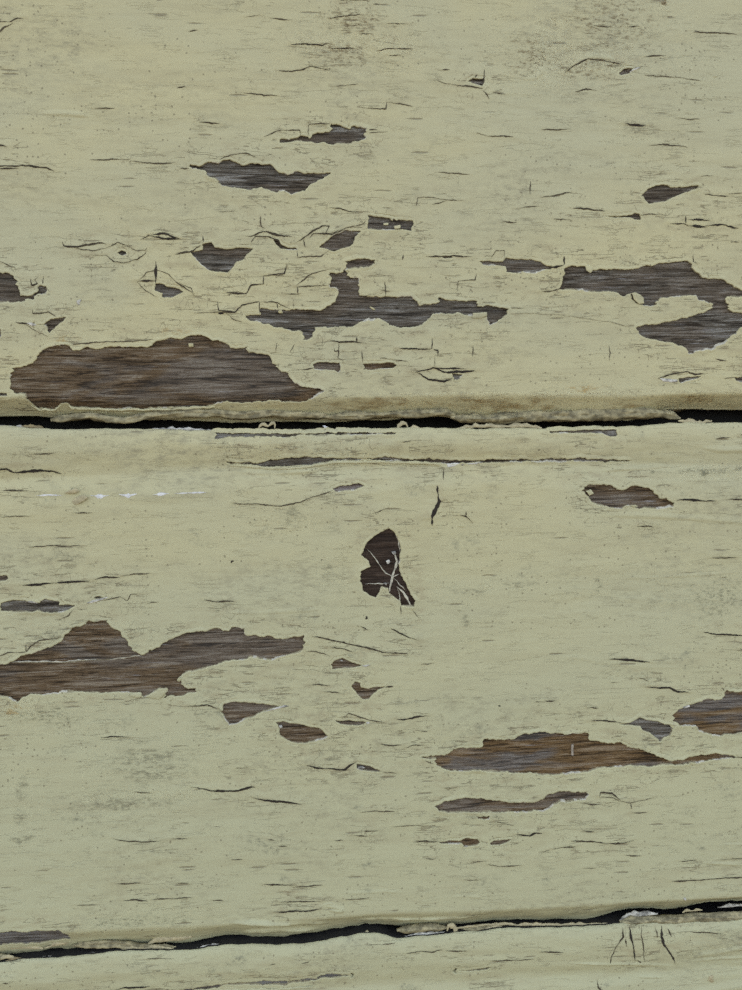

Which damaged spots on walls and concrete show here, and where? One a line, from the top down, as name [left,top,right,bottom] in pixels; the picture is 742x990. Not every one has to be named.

peeling [186,156,335,198]
peeling [188,239,257,276]
peeling [242,212,512,344]
peeling [477,255,742,357]
peeling [0,314,328,413]
peeling [211,427,399,442]
peeling [546,425,620,440]
peeling [579,481,678,512]
peeling [357,525,420,611]
peeling [0,617,310,705]
peeling [418,687,742,822]
crack [597,926,717,990]